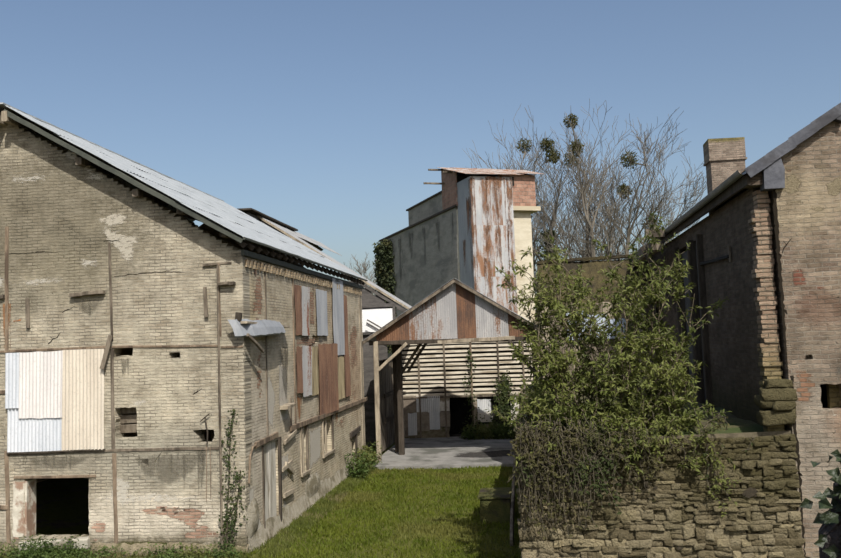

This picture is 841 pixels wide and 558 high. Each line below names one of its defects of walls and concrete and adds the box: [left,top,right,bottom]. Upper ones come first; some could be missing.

rust [463,178,516,312]
crack [773,189,794,388]
spalling [143,506,221,539]
crack [792,408,810,558]